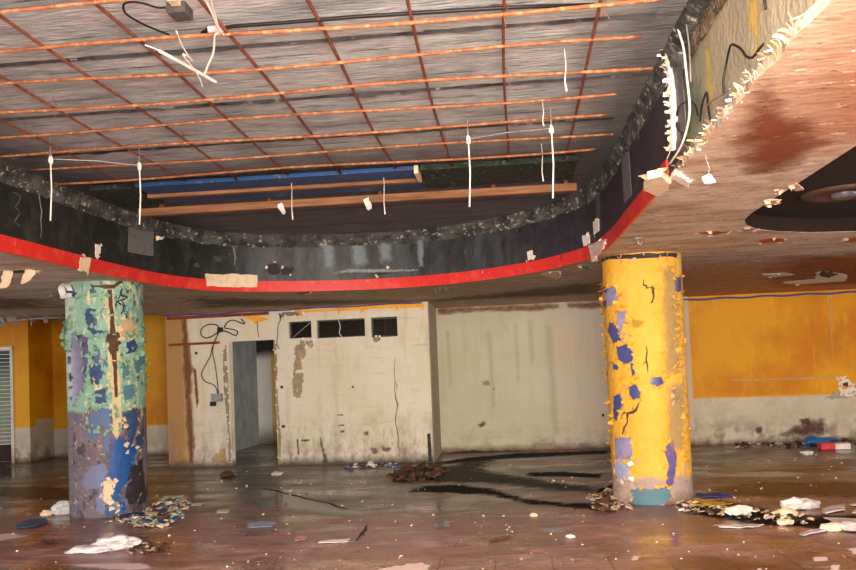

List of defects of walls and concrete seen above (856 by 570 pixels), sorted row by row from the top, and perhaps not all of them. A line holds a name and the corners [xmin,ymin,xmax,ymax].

spalling [0,0,665,187]
corrosion [705,49,714,109]
peeling [639,168,694,197]
spalling [759,183,804,208]
peeling [0,269,43,288]
flaking render [290,338,315,401]
peeling [578,217,692,505]
crack [393,364,401,461]
crack [620,400,641,435]
damp [782,418,824,436]